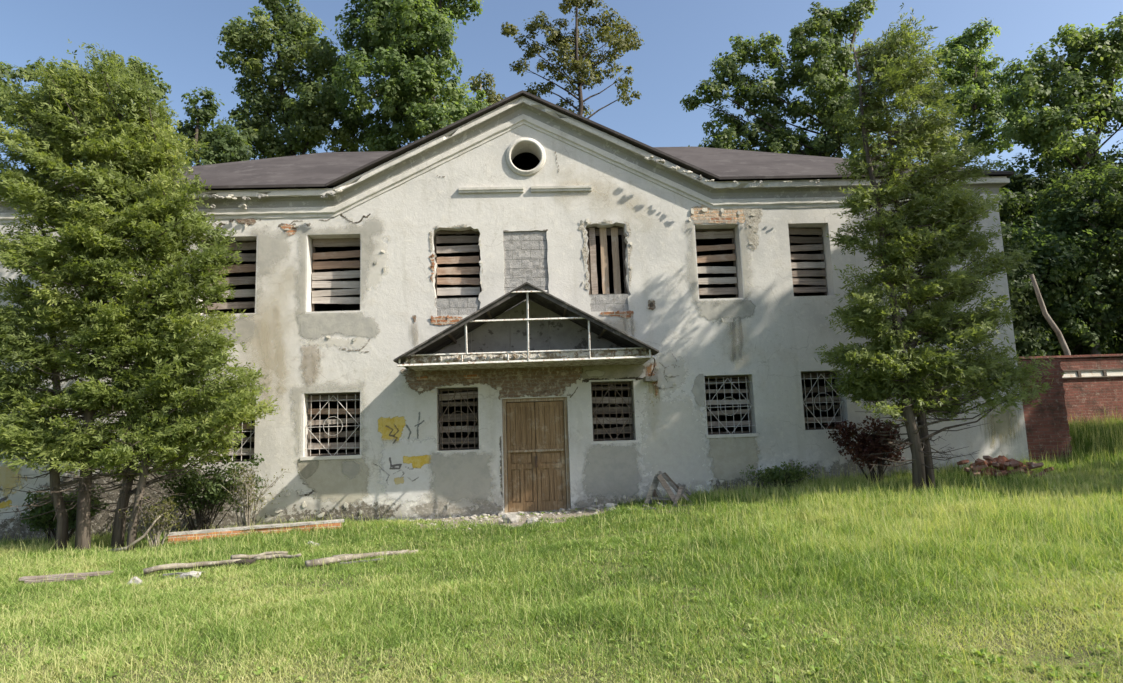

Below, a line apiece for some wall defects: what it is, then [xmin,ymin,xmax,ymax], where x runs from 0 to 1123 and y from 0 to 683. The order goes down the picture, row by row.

flaking render [280,224,298,236]
flaking render [689,205,763,250]
flaking render [430,315,462,325]
flaking render [400,354,680,400]